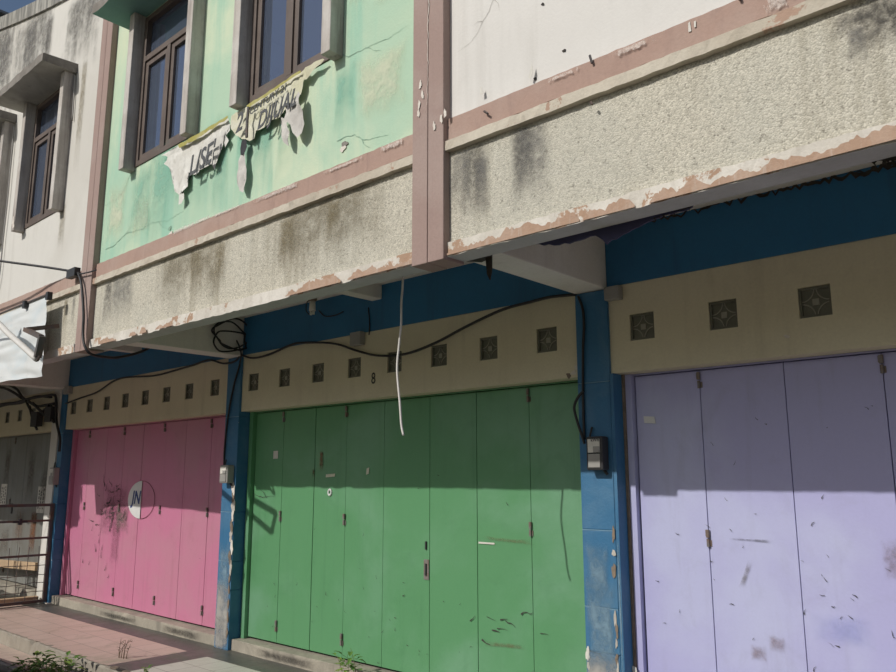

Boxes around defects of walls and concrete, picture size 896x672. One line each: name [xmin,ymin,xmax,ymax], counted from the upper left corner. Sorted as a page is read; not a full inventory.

damp [23,11,51,65]
damp [69,0,92,45]
crack [343,0,429,99]
peeling [650,125,896,203]
peeling [286,260,412,296]
peeling [446,198,635,280]
peeling [215,482,235,647]
peeling [585,526,622,672]